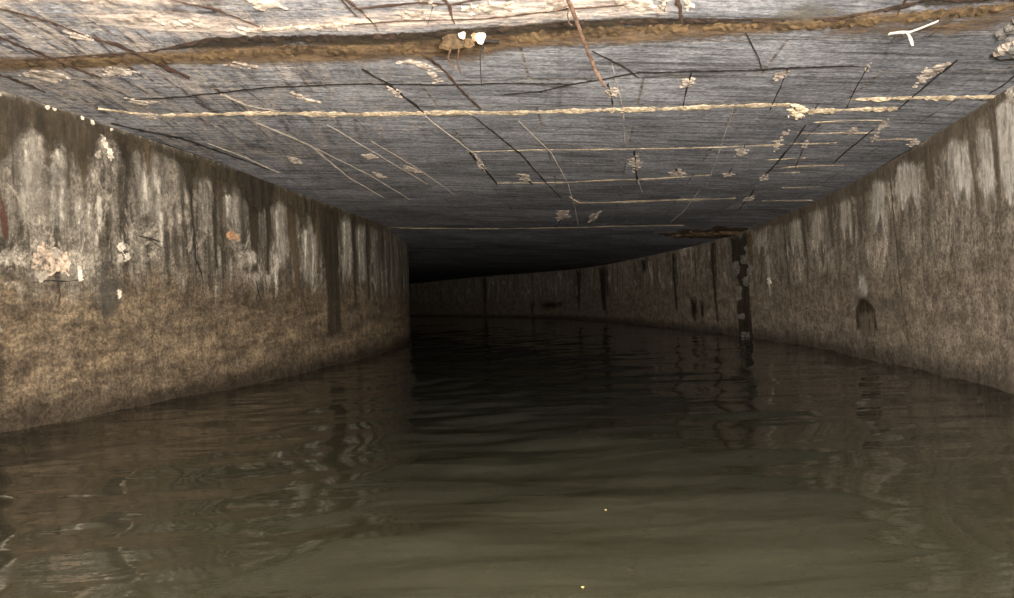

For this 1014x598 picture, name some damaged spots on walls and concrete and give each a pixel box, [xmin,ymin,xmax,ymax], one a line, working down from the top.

crack [172,0,266,30]
crack [341,0,625,28]
leakage [0,2,1014,72]
crack [659,0,695,28]
spalling [990,18,1014,61]
crack [0,8,872,226]
crack [833,60,958,164]
crack [189,178,204,283]
leakage [0,94,403,336]
leakage [751,85,1014,296]